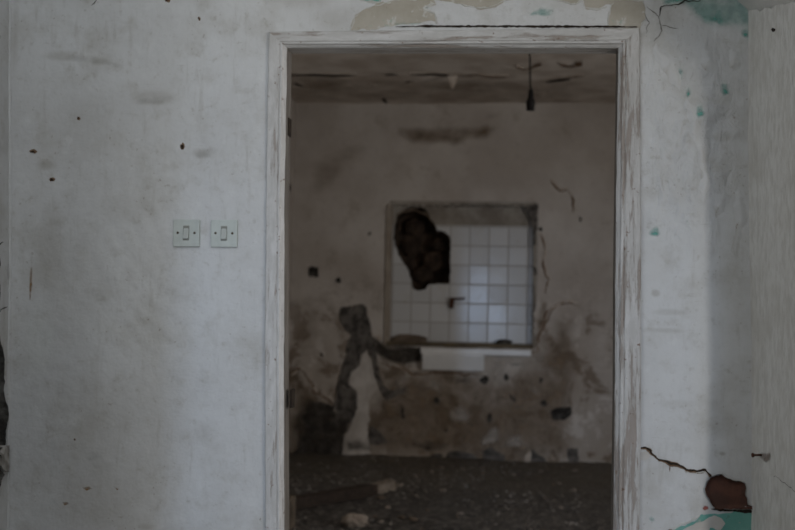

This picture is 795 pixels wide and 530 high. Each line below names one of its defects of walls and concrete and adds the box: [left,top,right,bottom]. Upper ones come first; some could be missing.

peeling [350,0,507,31]
crack [396,0,700,40]
peeling [557,0,646,28]
spalling [394,208,451,291]
spalling [0,341,10,486]
spalling [296,304,489,455]
water stain [380,333,567,453]
crack [641,446,712,478]
spalling [669,473,753,530]